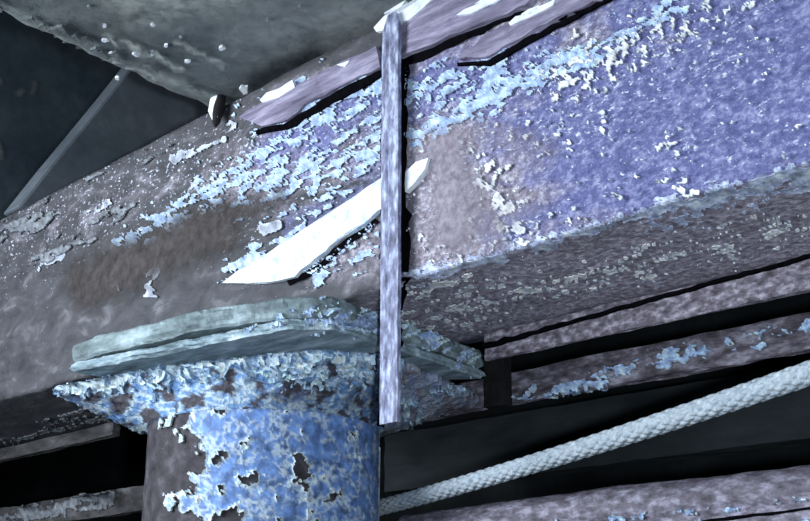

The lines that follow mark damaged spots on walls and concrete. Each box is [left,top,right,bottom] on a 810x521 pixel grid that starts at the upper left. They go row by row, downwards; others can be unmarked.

spalling [27,16,120,62]
peeling [0,192,58,243]
peeling [26,233,98,272]
peeling [85,46,382,340]
peeling [374,0,810,402]
peeling [0,349,380,448]
peeling [401,359,425,430]
peeling [158,406,380,521]
peeling [608,512,646,521]